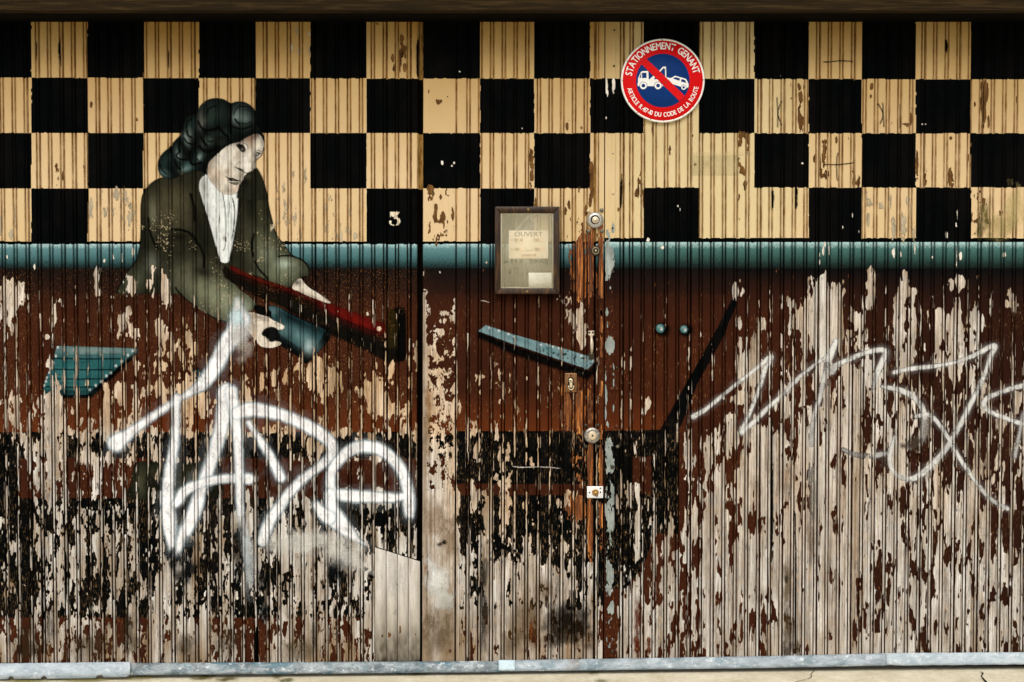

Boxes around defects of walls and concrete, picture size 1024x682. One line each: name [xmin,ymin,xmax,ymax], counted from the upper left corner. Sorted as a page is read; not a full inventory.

spalling [738,131,749,201]
spalling [801,136,849,179]
peeling [0,161,1024,663]